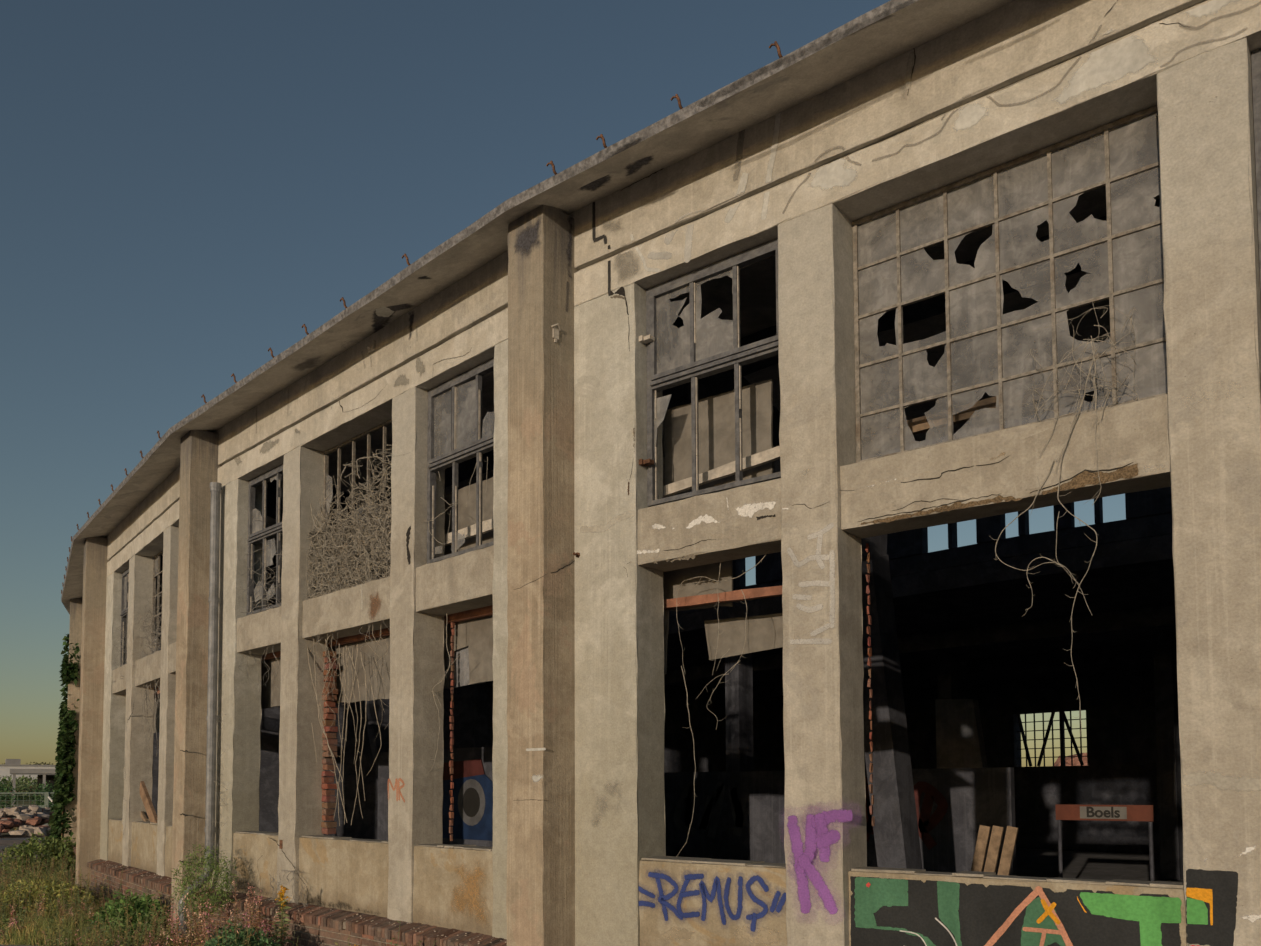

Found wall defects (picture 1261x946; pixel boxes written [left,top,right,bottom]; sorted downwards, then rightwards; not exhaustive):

peeling [609,138,645,157]
peeling [626,156,653,176]
peeling [581,175,610,191]
crack [592,202,611,296]
spalling [858,462,1138,525]
peeling [726,497,776,520]
peeling [652,514,719,529]
flaking render [865,543,875,826]